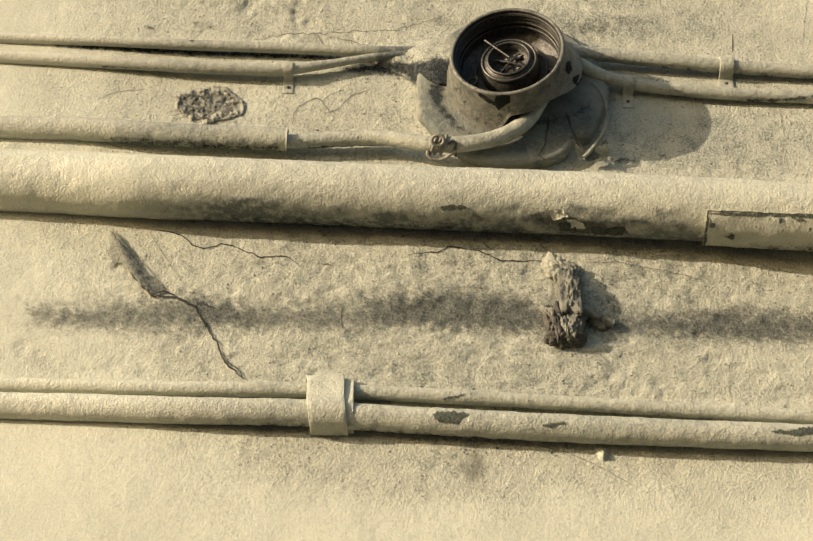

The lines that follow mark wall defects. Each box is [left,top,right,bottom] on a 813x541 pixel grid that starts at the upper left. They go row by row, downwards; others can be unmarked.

spalling [170,86,246,125]
flaking render [108,227,166,295]
crack [414,241,541,262]
crack [131,230,298,379]
water stain [32,292,547,333]
water stain [585,310,813,342]